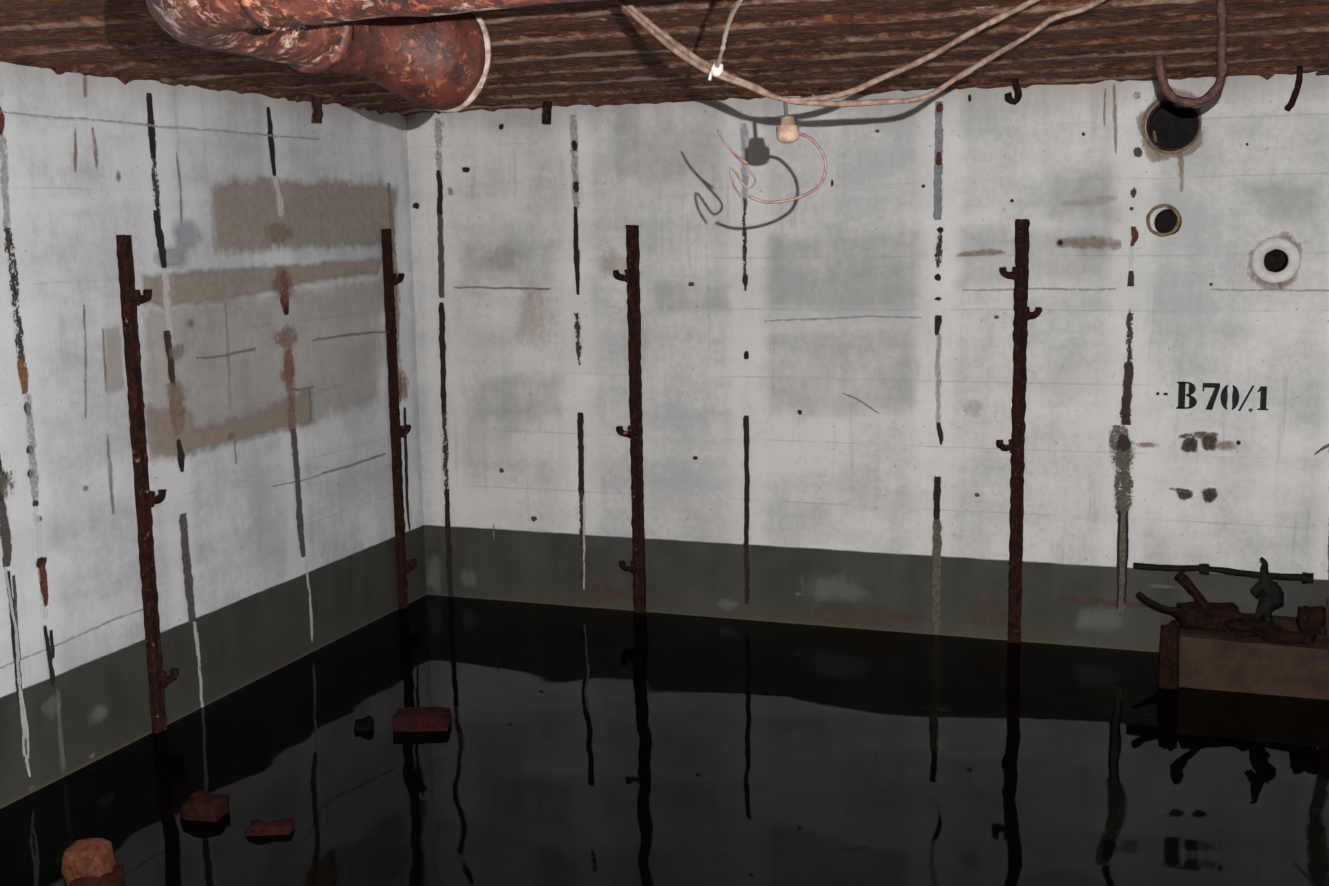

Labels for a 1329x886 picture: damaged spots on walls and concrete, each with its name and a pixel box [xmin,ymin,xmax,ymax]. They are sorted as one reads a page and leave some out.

rust [17,359,28,394]
rust [392,242,407,402]